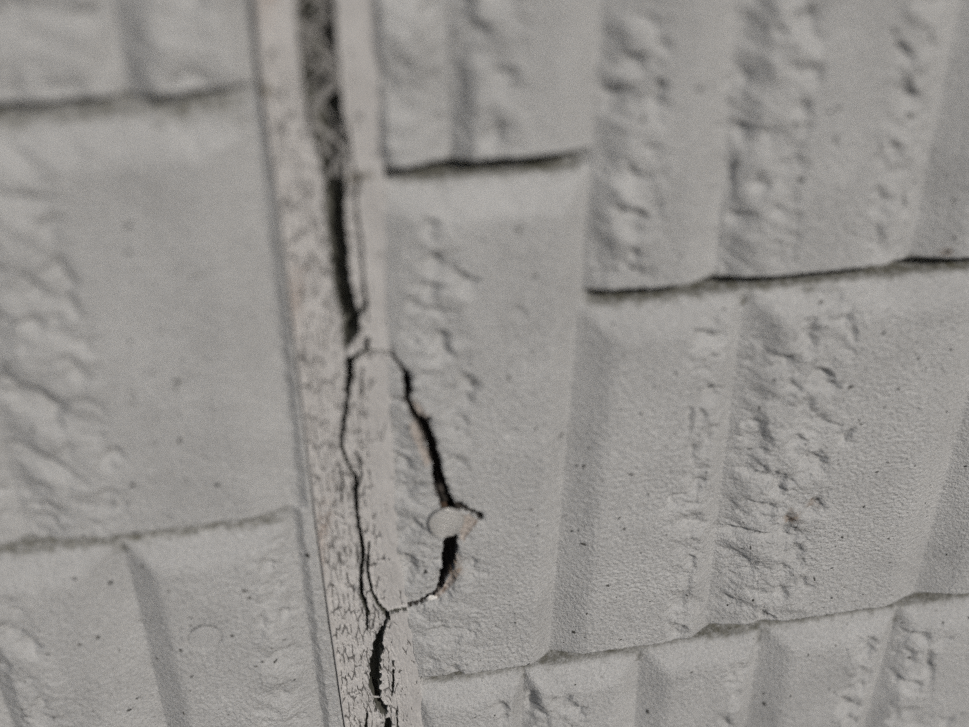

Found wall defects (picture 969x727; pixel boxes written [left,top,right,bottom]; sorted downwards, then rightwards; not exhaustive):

crack [263,34,484,727]